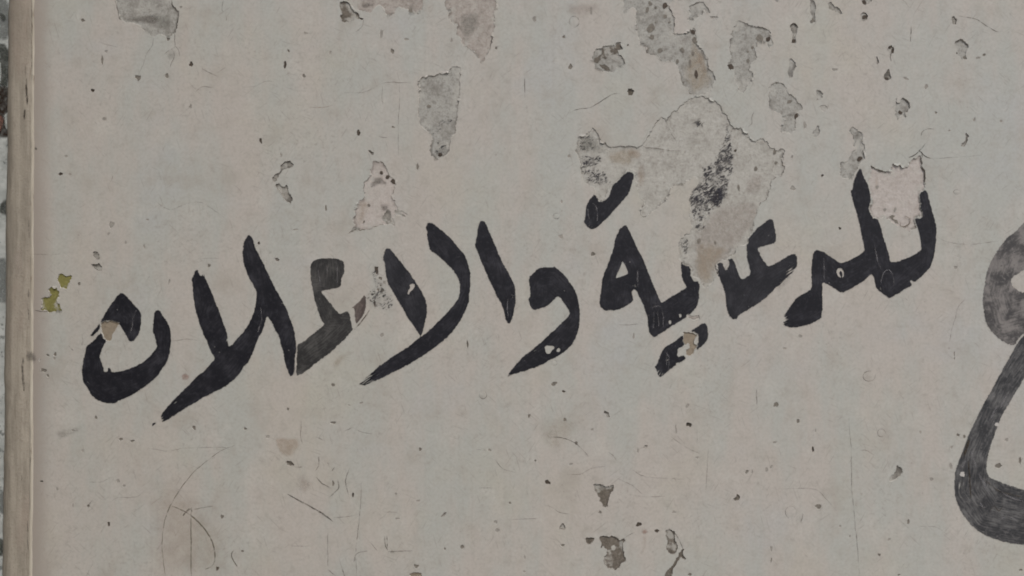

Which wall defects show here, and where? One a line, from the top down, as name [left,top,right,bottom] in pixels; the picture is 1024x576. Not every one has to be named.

peeling [115,0,182,41]
peeling [340,0,423,22]
peeling [444,0,498,64]
peeling [417,66,461,161]
peeling [567,0,793,288]
peeling [768,58,820,138]
peeling [272,152,294,203]
peeling [348,150,407,234]
peeling [840,127,926,232]
peeling [40,273,80,313]
peeling [585,536,626,570]